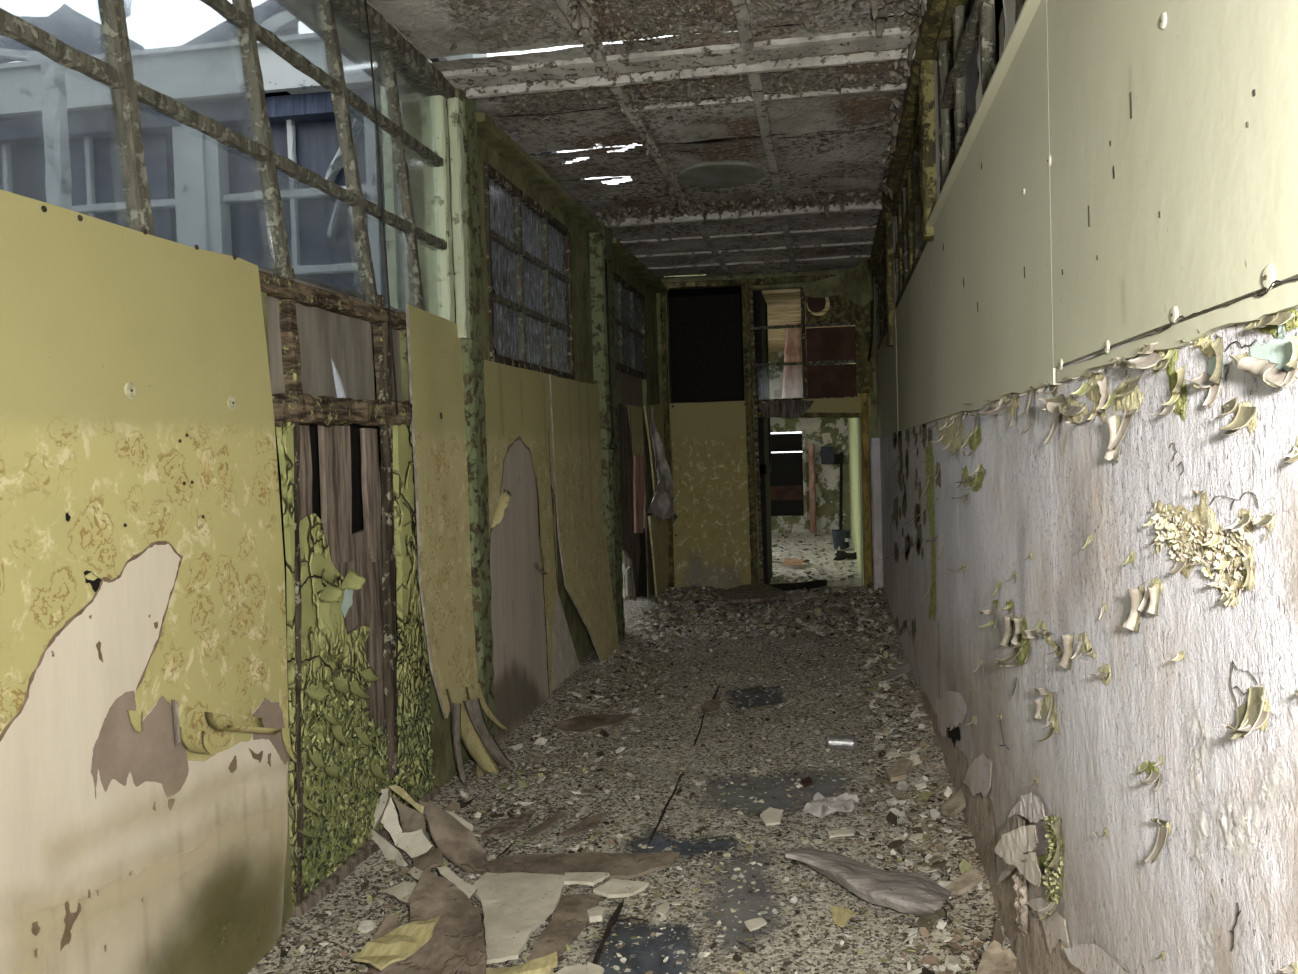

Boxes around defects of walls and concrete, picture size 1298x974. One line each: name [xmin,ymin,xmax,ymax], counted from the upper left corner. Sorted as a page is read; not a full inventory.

crack [1054,278,1298,370]
spalling [880,308,1298,974]
peeling [60,890,99,951]